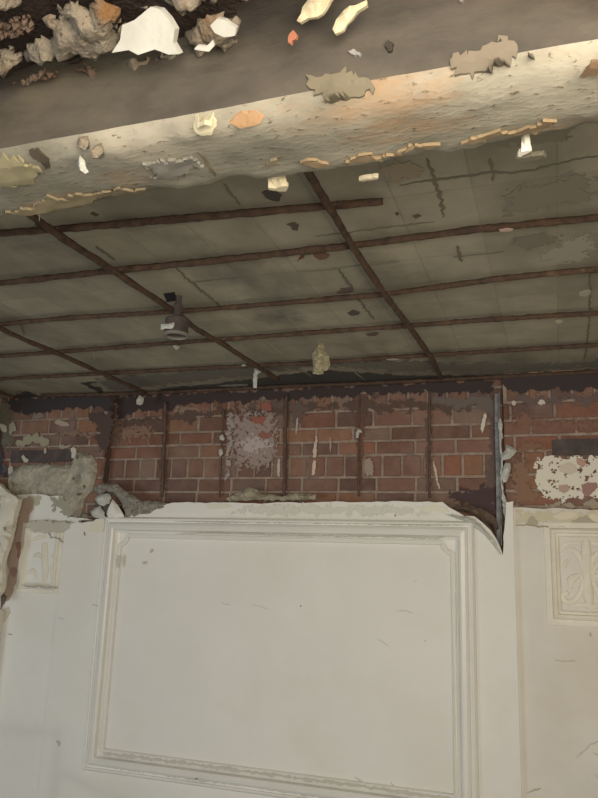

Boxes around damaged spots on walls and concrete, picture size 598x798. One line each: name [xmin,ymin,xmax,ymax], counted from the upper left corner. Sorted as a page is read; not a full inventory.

spalling [580,59,598,78]
spalling [0,147,50,189]
peeling [193,112,217,136]
spalling [346,142,440,165]
spalling [461,119,557,161]
spalling [0,158,598,399]
peeling [0,422,79,462]
peeling [533,455,598,523]
peeling [88,492,114,533]
spalling [0,496,70,622]